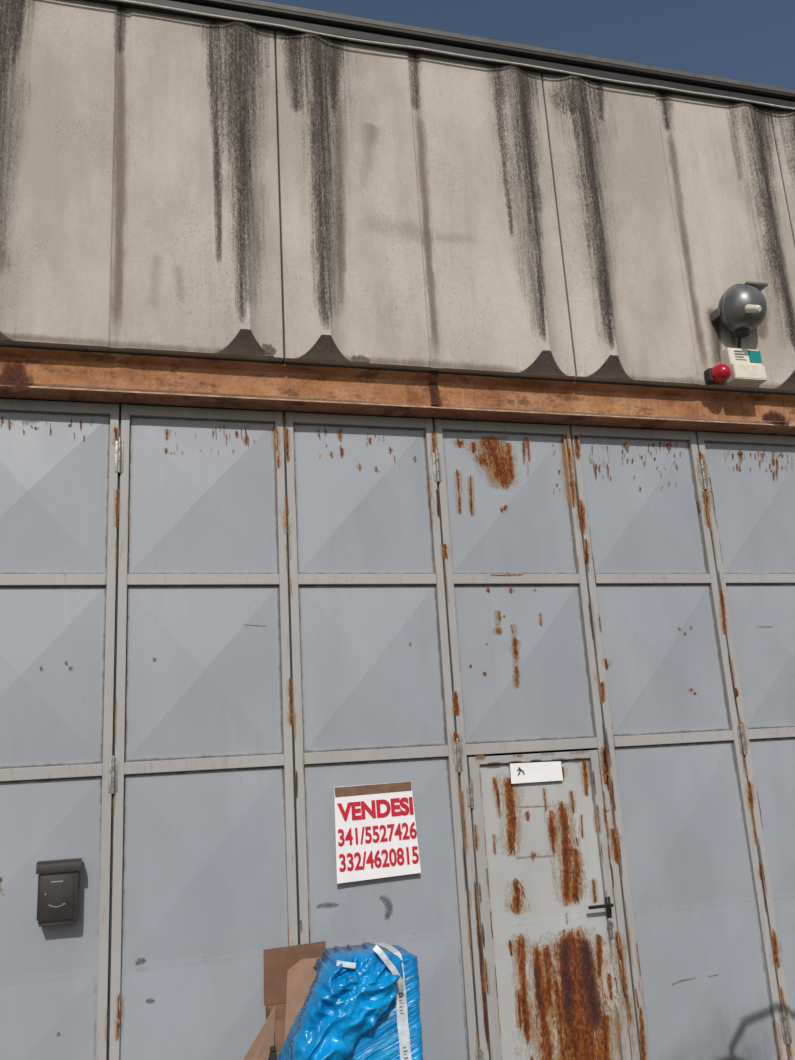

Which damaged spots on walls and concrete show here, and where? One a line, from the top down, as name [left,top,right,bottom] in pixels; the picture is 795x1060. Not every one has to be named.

damp [202,20,274,357]
damp [282,32,362,362]
damp [491,65,566,375]
damp [554,75,634,379]
damp [747,93,795,349]
corrosion [456,469,473,515]
corrosion [454,436,530,490]
corrosion [552,434,681,581]
corrosion [725,449,793,480]
damp [768,370,795,390]
corrosion [458,732,646,1060]
corrosion [748,781,767,912]